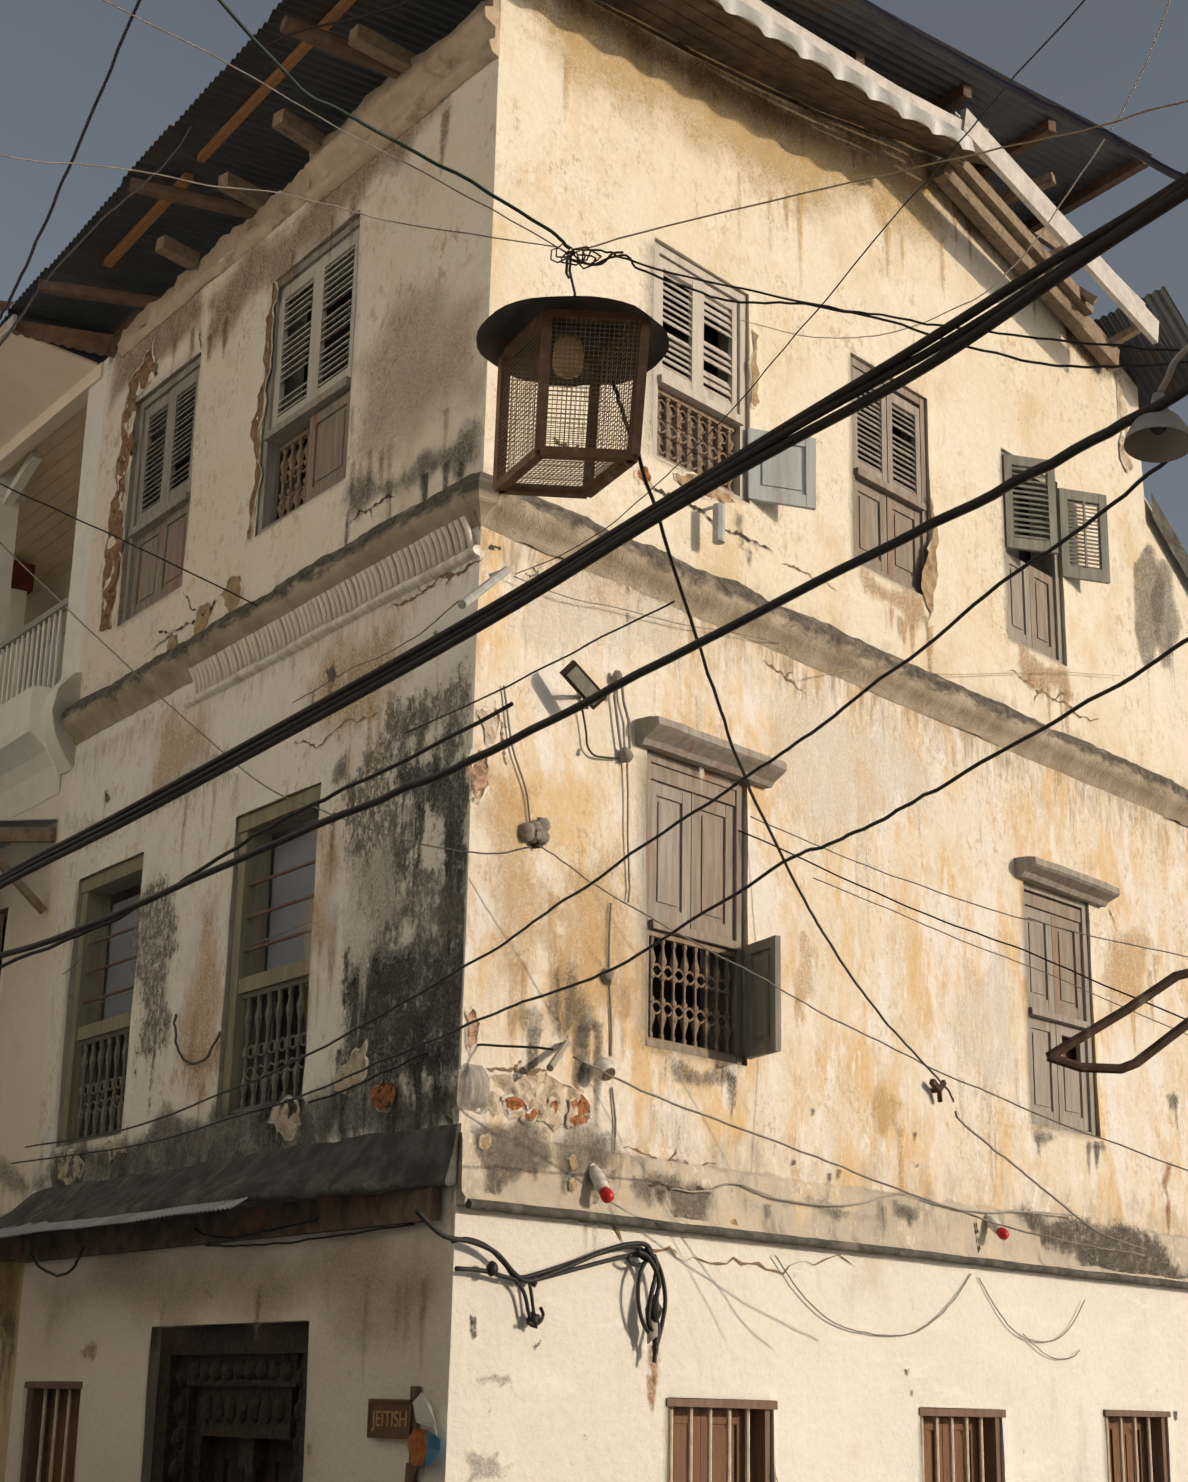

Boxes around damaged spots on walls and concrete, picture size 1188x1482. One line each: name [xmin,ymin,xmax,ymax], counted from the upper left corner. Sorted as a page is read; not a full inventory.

flaking render [244,281,279,544]
flaking render [99,334,158,632]
leakage [1134,545,1182,671]
leakage [53,658,472,1186]
flaking render [475,1072,593,1155]
flaking render [566,1152,578,1191]
crack [556,1218,859,1275]
leakage [1020,1206,1188,1279]